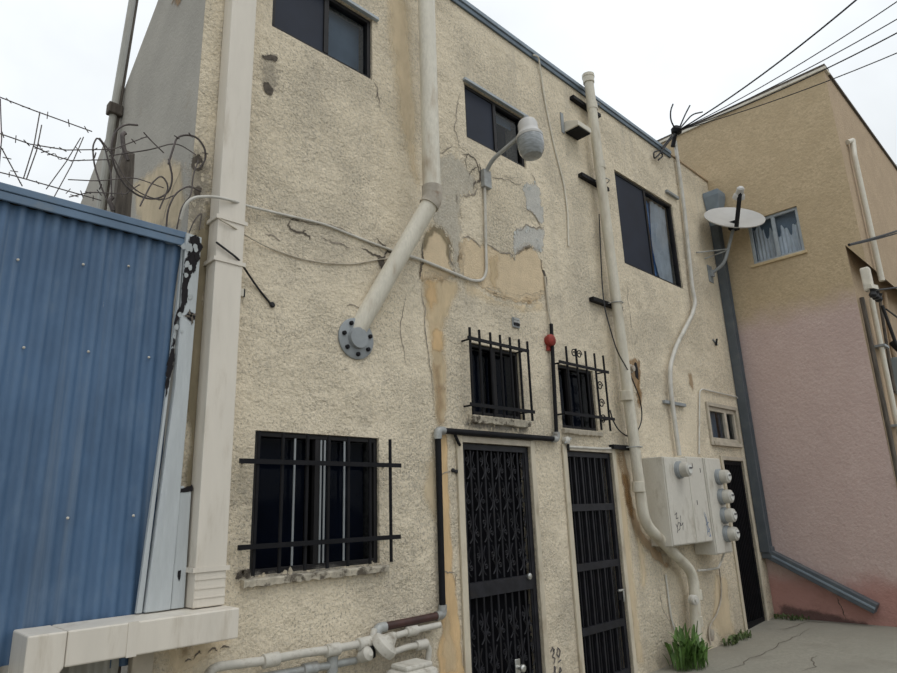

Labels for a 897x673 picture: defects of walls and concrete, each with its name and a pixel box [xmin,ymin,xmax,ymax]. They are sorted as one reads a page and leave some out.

crack [441,93,538,185]
crack [267,217,391,269]
peeling [419,153,547,304]
crack [400,287,434,396]